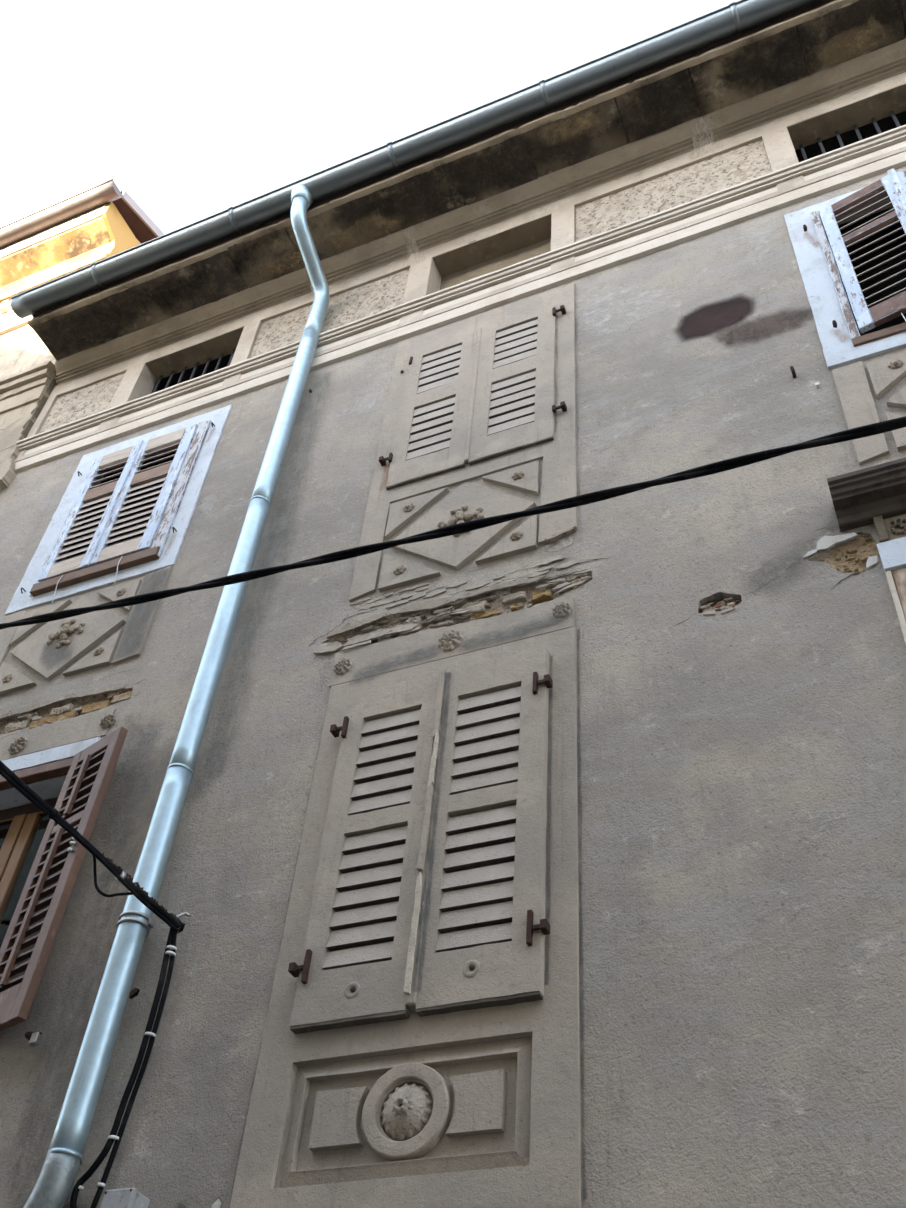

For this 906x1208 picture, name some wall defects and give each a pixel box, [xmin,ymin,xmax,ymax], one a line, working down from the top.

leakage [37,270,205,355]
spalling [803,532,880,574]
spalling [313,528,593,654]
spalling [700,597,742,615]
spalling [0,684,133,738]